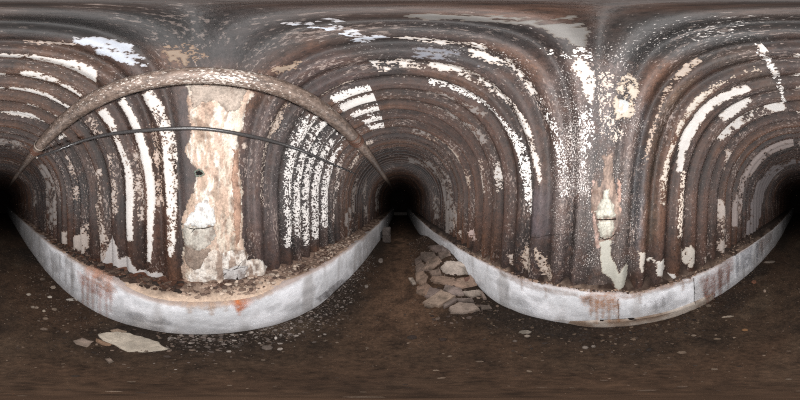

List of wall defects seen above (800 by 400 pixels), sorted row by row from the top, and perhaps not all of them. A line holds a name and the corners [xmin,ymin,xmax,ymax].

peeling [23,36,149,67]
peeling [32,90,178,278]
peeling [283,80,393,248]
peeling [280,18,570,220]
peeling [453,204,477,241]
peeling [540,47,640,173]
spalling [590,152,628,290]
peeling [681,245,706,268]
peeling [716,199,727,253]
peeling [659,43,786,238]